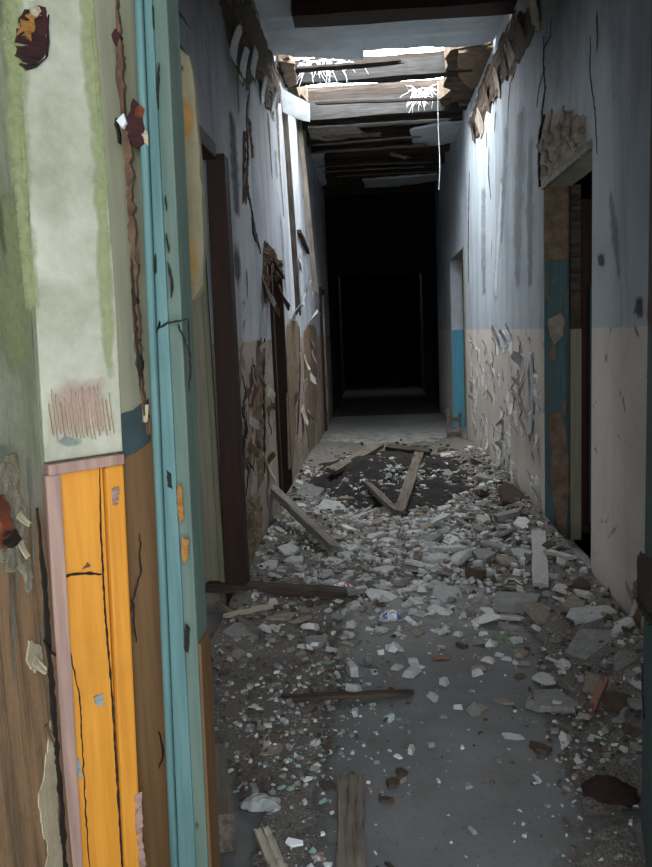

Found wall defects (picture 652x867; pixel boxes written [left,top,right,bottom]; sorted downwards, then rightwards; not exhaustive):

spalling [13,5,50,71]
crack [242,88,261,254]
peeling [468,0,540,143]
crack [536,25,551,120]
spalling [536,105,587,187]
crack [589,37,597,150]
peeling [239,249,320,566]
crack [130,534,142,642]
peeling [26,640,47,675]
crack [99,468,123,867]
peeling [38,721,63,867]
crack [157,731,165,768]